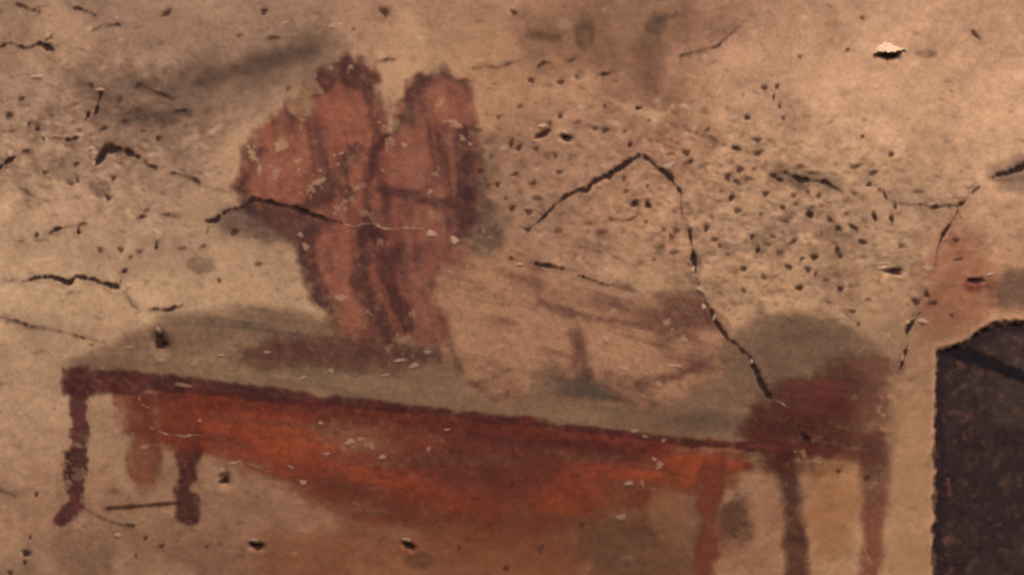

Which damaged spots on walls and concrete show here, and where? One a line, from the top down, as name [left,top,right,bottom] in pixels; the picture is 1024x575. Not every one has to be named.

crack [53,88,201,184]
crack [205,197,341,223]
crack [529,153,682,228]
crack [900,163,1024,242]
crack [428,231,458,243]
crack [28,269,130,292]
crack [510,257,608,285]
crack [152,304,179,312]
crack [688,229,772,398]
crack [900,319,927,369]